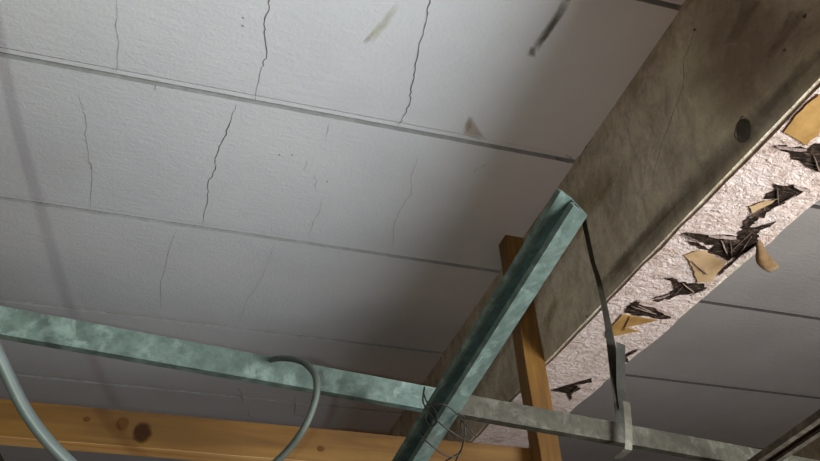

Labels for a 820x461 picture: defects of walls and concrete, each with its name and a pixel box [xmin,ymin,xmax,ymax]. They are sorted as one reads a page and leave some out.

crack [255,0,270,99]
crack [398,0,431,126]
leakage [540,16,558,40]
crack [203,108,236,221]
peeling [774,94,820,173]
peeling [612,183,810,336]
peeling [551,378,592,400]